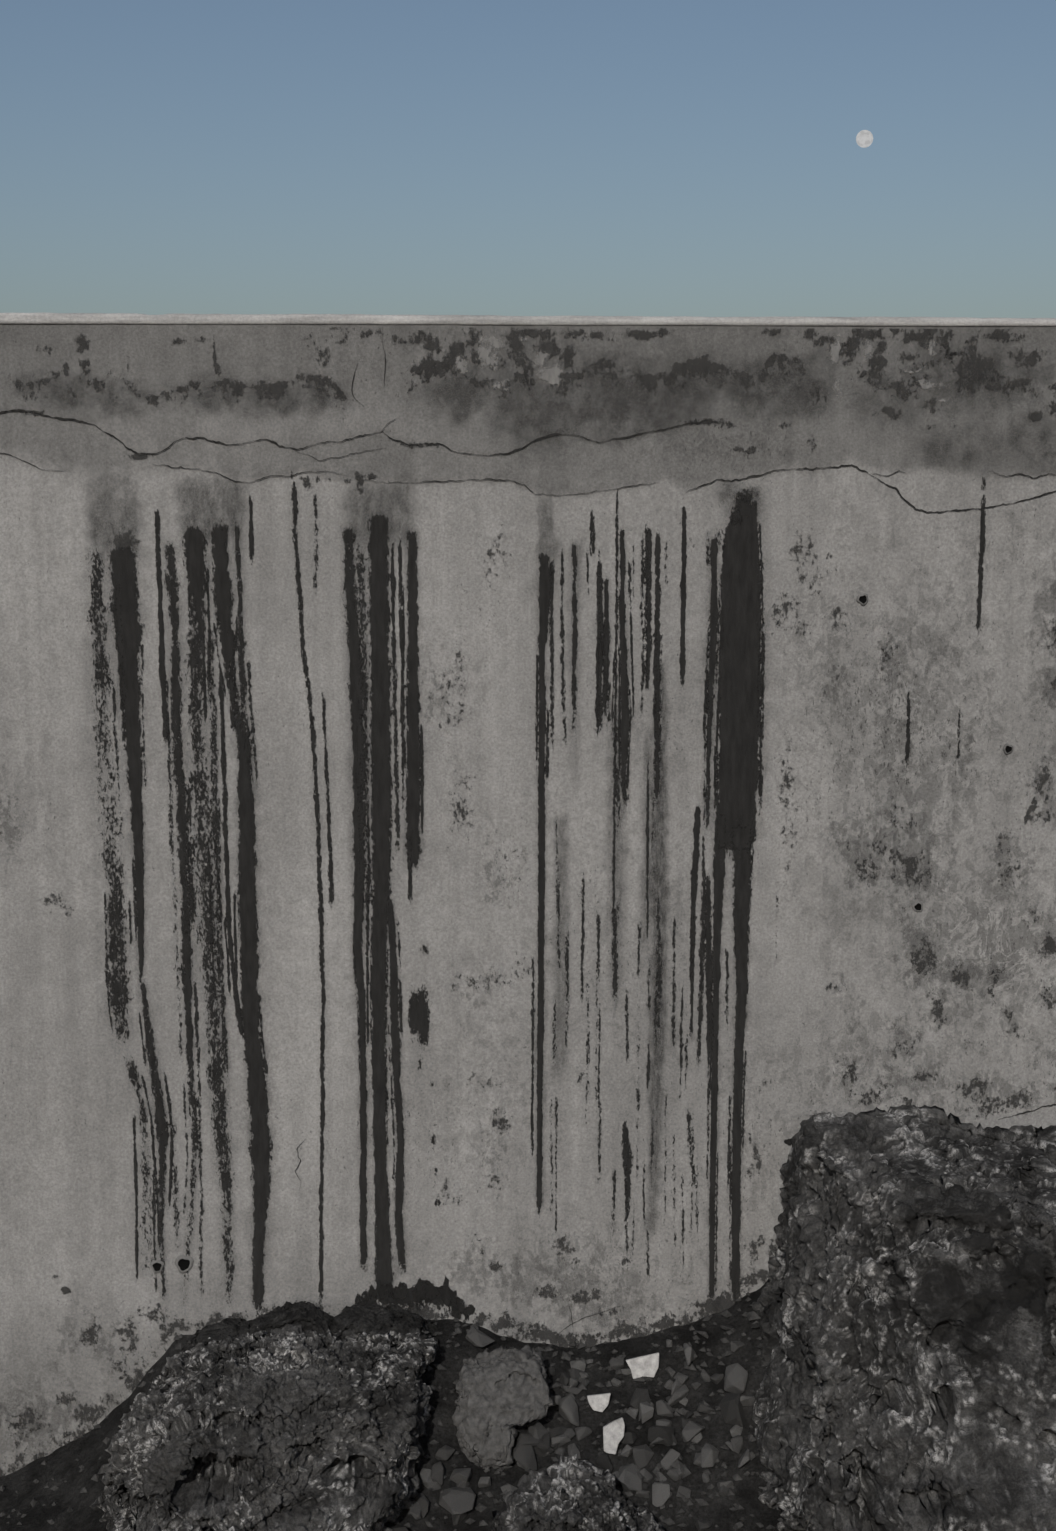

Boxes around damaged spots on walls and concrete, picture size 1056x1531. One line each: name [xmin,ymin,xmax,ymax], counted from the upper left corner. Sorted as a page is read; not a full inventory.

damp [15,334,347,413]
crack [0,330,1056,513]
damp [572,328,826,434]
damp [1028,382,1056,422]
damp [291,471,464,1315]
damp [378,487,837,1348]
damp [847,798,931,909]
damp [0,484,275,1477]
damp [843,1057,937,1108]
damp [956,1078,1032,1117]